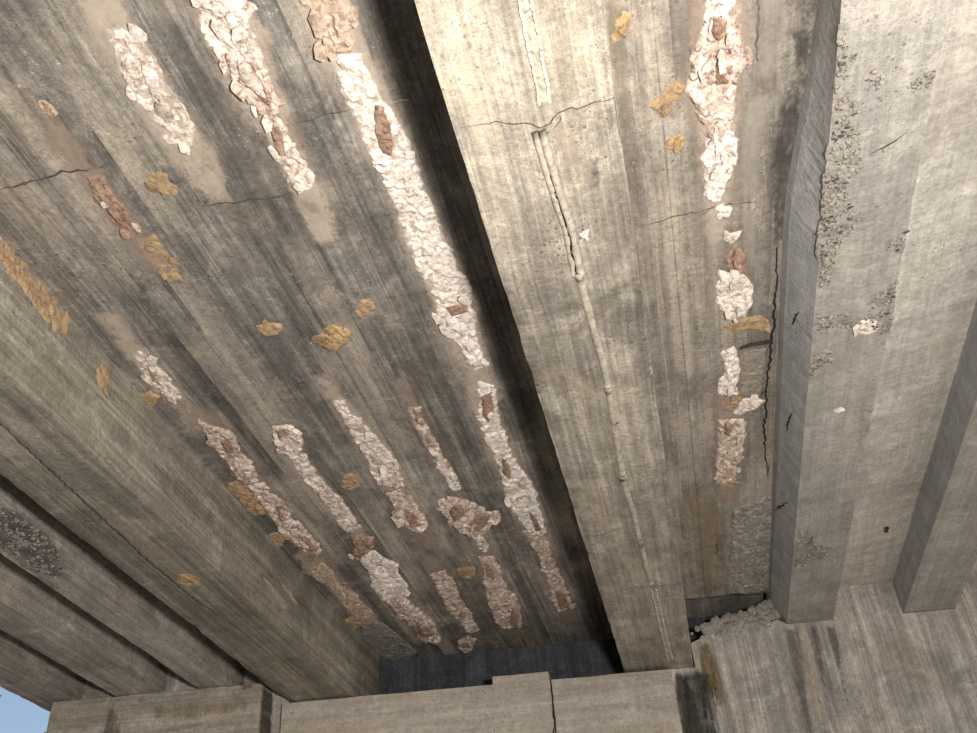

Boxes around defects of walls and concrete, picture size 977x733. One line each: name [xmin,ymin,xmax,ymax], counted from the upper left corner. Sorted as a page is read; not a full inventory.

crack [1,163,109,190]
spalling [77,0,231,201]
spalling [191,0,338,243]
spalling [298,0,580,653]
crack [462,97,615,134]
peeling [610,11,632,43]
crack [637,202,753,226]
spalling [648,0,772,593]
crack [761,247,799,476]
water stain [0,510,57,573]
spalling [96,313,441,660]